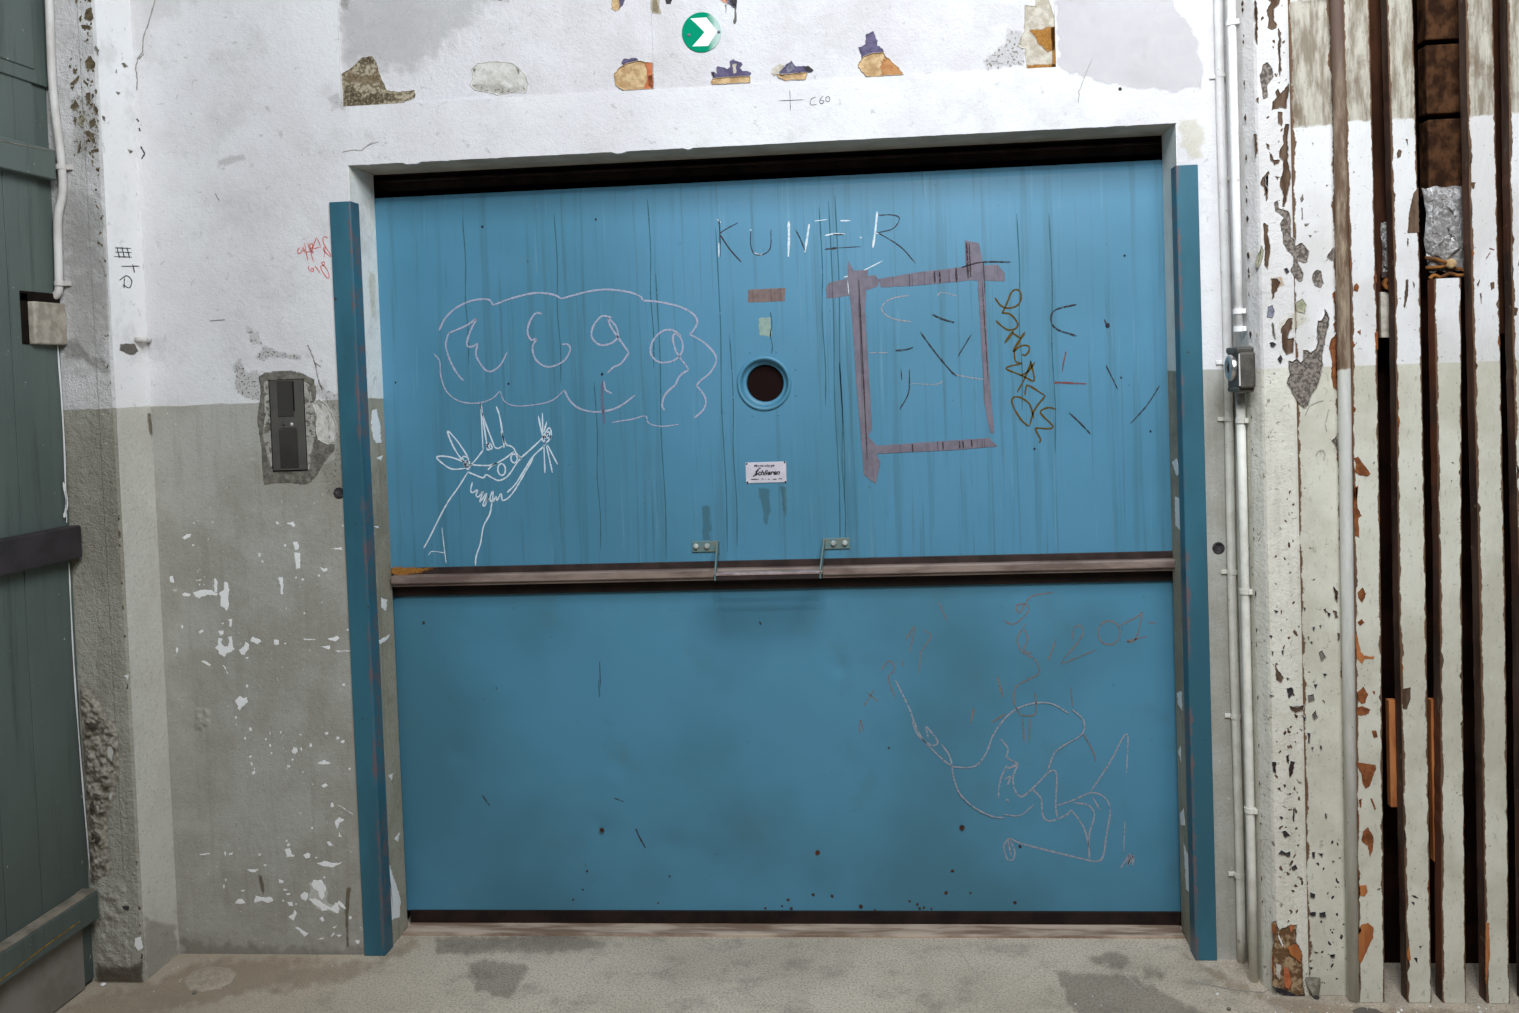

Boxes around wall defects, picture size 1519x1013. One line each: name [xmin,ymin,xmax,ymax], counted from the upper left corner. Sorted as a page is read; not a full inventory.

flaking render [651,0,672,14]
peeling [721,0,737,24]
flaking render [341,56,416,107]
flaking render [614,58,654,91]
flaking render [711,59,751,85]
flaking render [772,61,813,81]
flaking render [858,31,904,77]
peeling [1241,0,1378,407]
flaking render [312,399,338,445]
spalling [170,576,286,674]
spalling [235,685,345,775]
spalling [223,783,360,944]